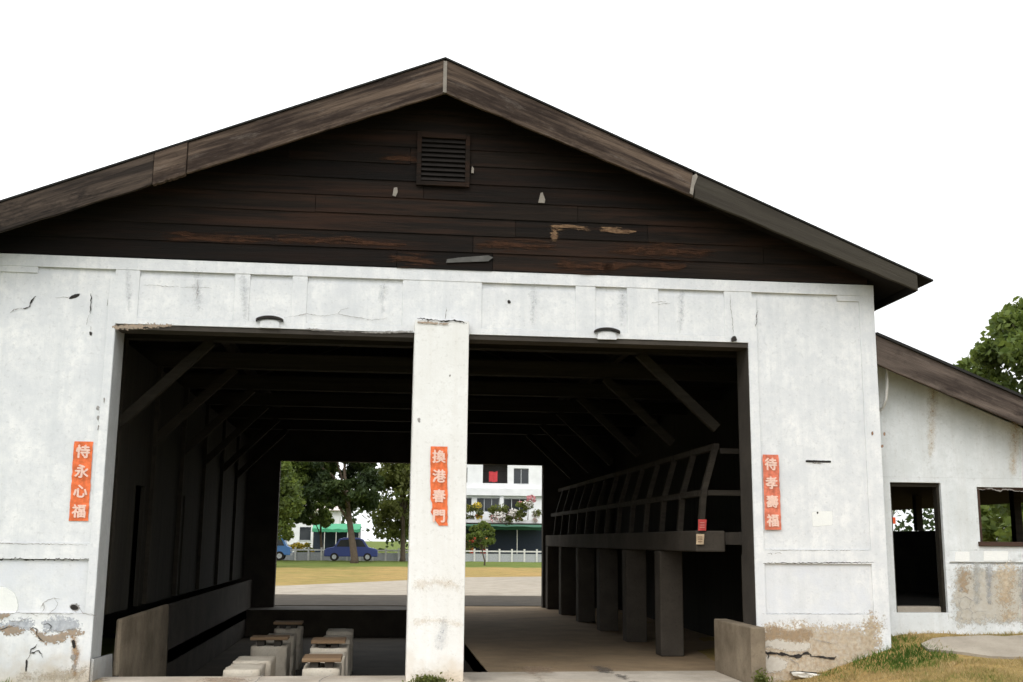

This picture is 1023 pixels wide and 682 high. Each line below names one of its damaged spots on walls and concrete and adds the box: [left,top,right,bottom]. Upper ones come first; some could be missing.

spalling [0,604,97,645]
peeling [764,612,883,681]
water stain [951,562,1023,628]